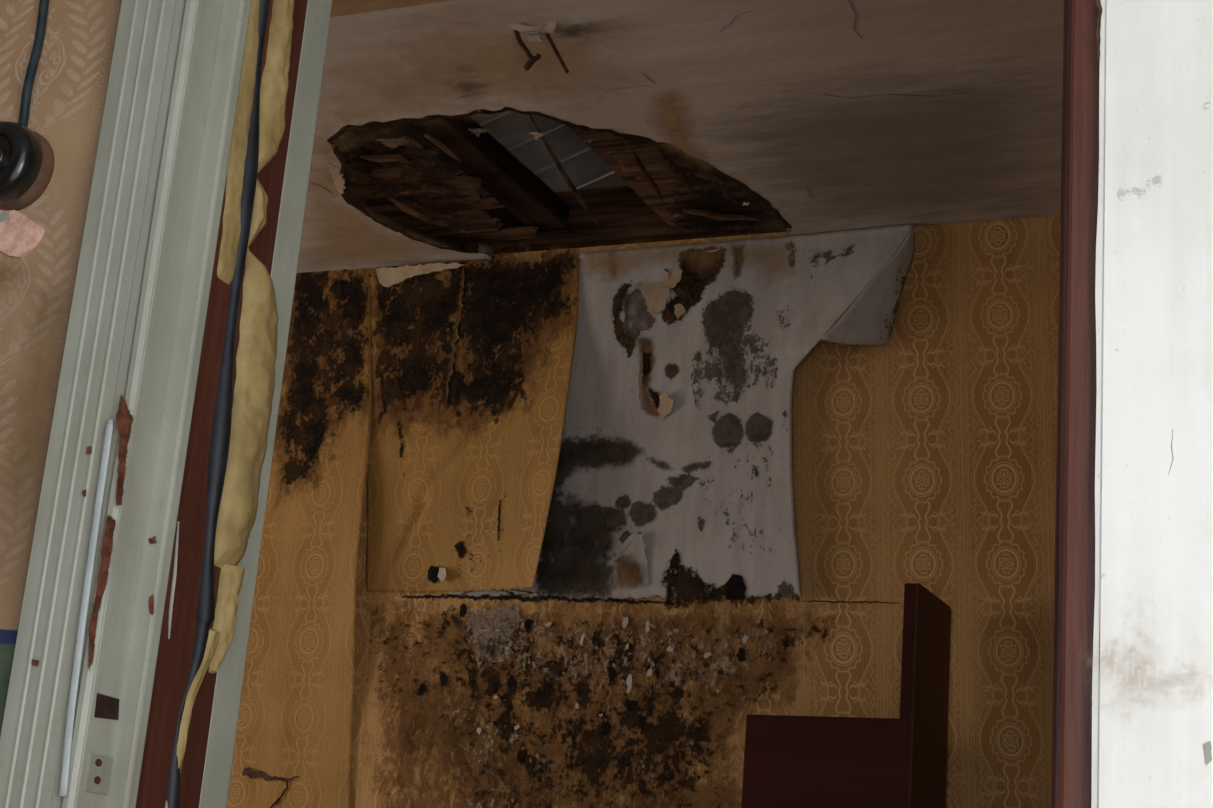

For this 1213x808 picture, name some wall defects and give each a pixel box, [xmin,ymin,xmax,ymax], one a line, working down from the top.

peeling [328,163,346,194]
peeling [376,139,409,148]
flaking render [641,245,726,325]
damp [810,244,854,277]
damp [274,205,578,492]
damp [348,95,827,808]
peeling [59,395,133,797]
crack [242,766,299,808]